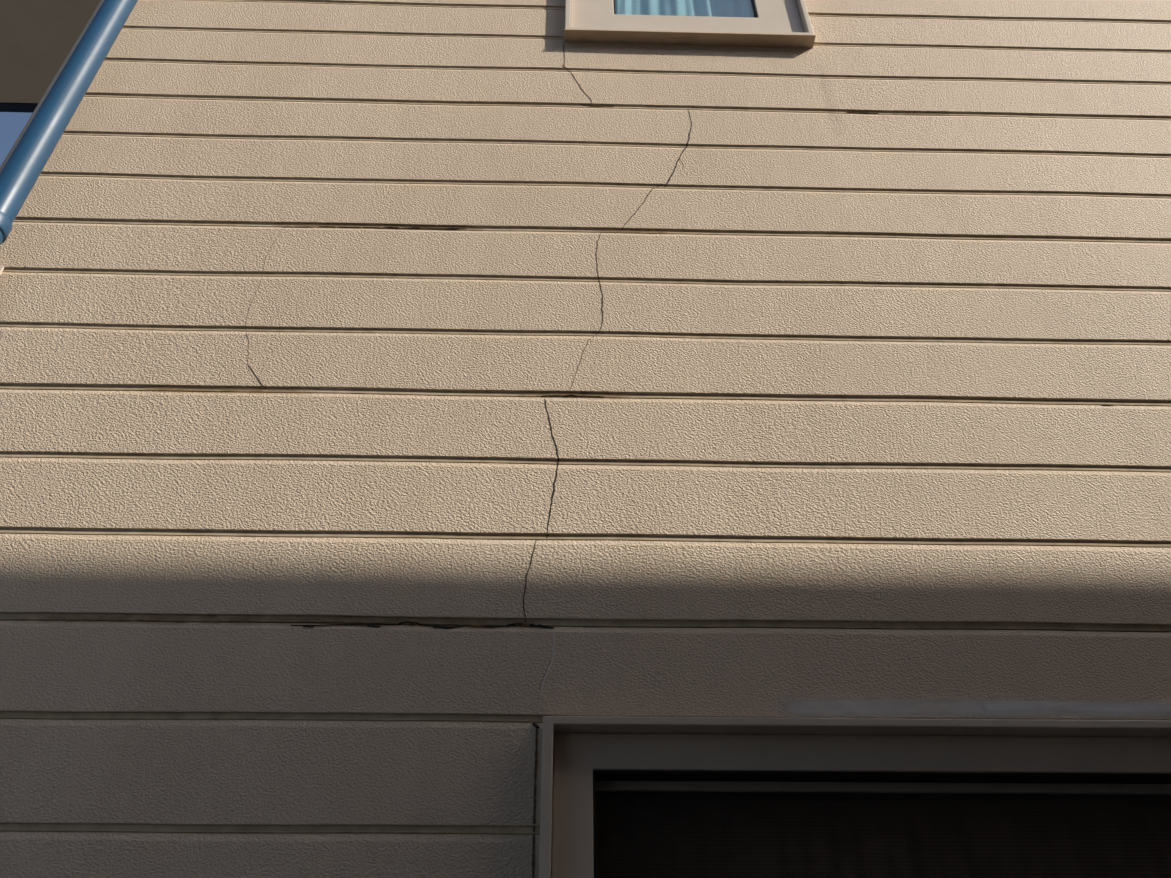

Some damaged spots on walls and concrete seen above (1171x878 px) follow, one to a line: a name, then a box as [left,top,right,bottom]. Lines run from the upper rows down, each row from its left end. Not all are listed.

crack [562,42,593,105]
crack [246,228,285,389]
crack [523,110,692,623]